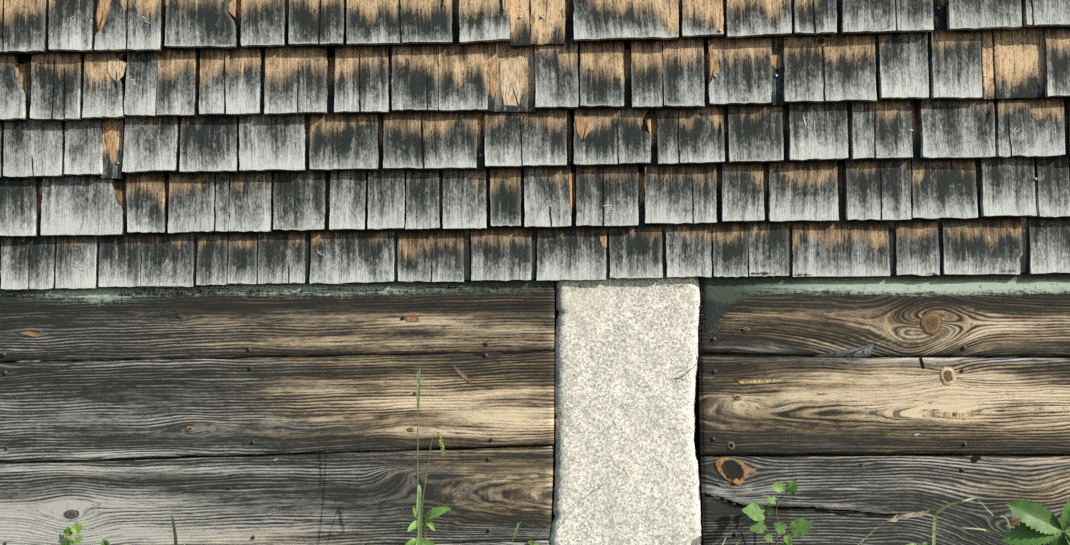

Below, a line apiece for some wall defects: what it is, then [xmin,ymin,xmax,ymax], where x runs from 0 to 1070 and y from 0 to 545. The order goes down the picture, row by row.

spalling [96,0,109,31]
spalling [107,58,126,82]